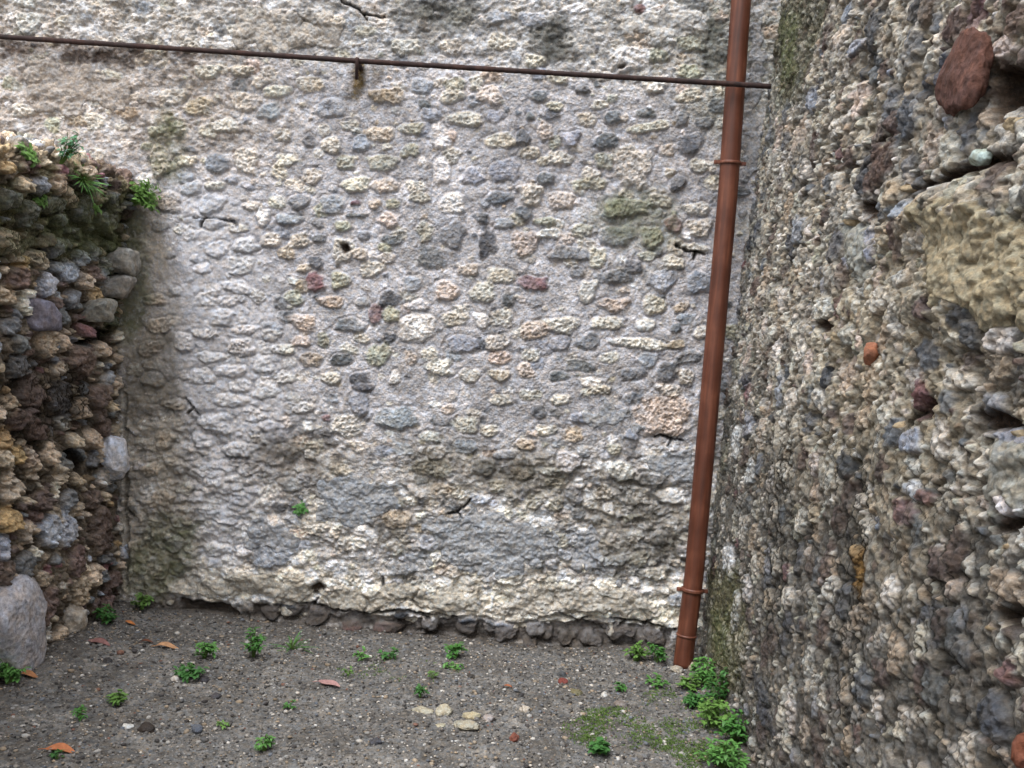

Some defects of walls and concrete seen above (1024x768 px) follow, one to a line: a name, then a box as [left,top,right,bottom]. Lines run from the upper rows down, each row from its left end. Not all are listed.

crack [341,1,386,21]
crack [195,217,238,228]
crack [675,245,704,260]